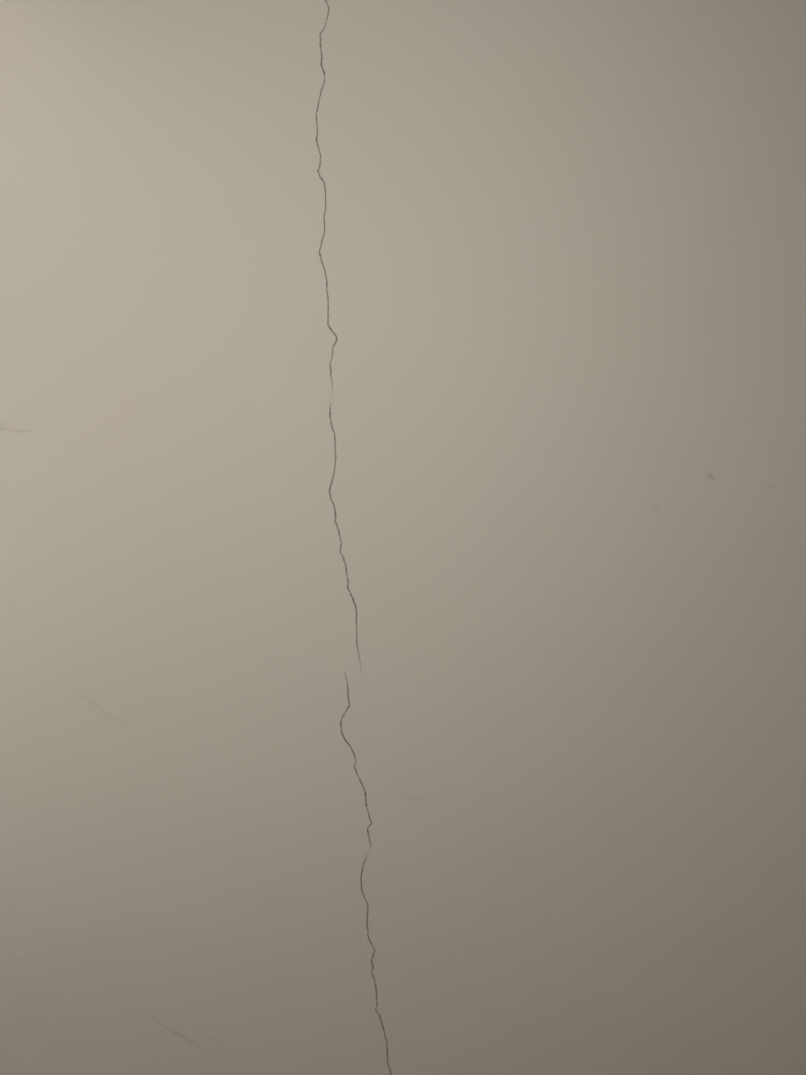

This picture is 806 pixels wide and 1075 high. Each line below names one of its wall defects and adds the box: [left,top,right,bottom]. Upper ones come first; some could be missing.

crack [314,0,393,1075]